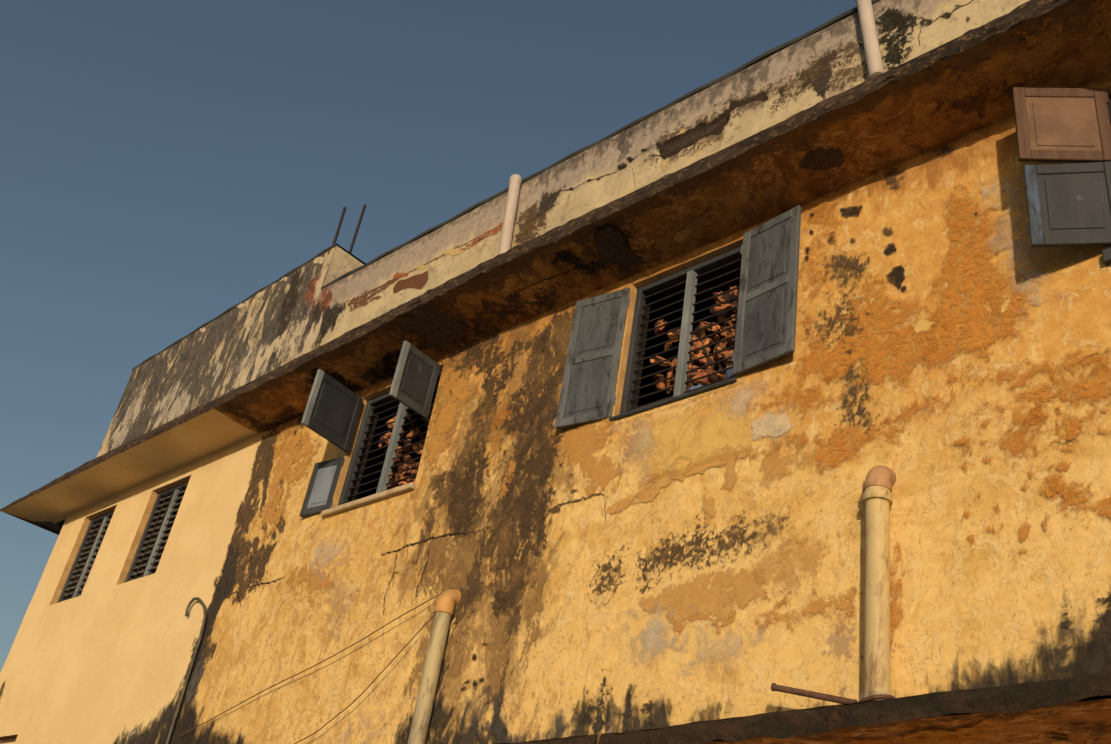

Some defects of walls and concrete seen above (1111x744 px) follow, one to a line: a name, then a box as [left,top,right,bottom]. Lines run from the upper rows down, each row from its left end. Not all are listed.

leakage [883,43,903,70]
crack [915,0,973,46]
spalling [644,86,784,170]
spalling [799,149,845,170]
leakage [99,250,346,452]
leakage [395,179,1111,744]
crack [548,489,606,524]
leakage [113,406,322,744]
leakage [276,539,346,607]
crack [381,526,492,613]